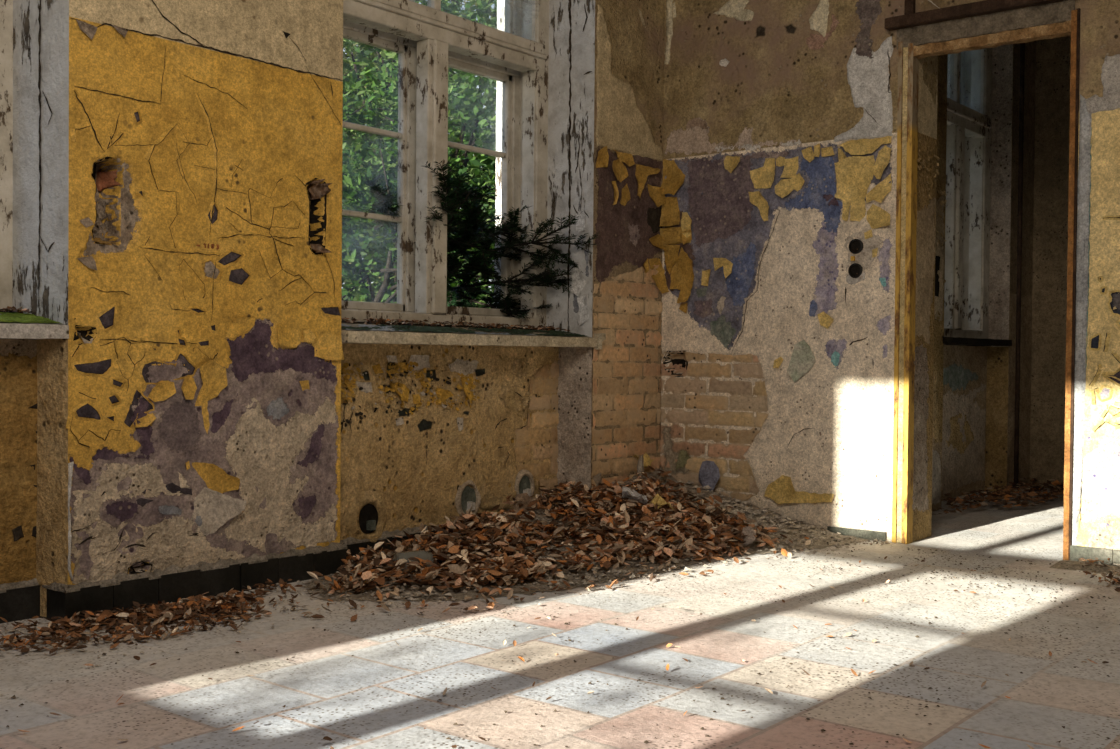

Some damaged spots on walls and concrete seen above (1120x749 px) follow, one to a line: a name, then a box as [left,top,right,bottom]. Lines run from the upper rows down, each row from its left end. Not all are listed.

spalling [77,156,145,270]
crack [38,0,342,391]
crack [1102,213,1120,221]
crack [66,392,121,447]
peeling [68,304,488,584]
peeling [571,136,893,504]
peeling [1089,333,1102,351]
peeling [1080,436,1120,550]
crack [1089,333,1120,432]
peeling [1096,368,1120,413]
peeling [1097,276,1120,329]